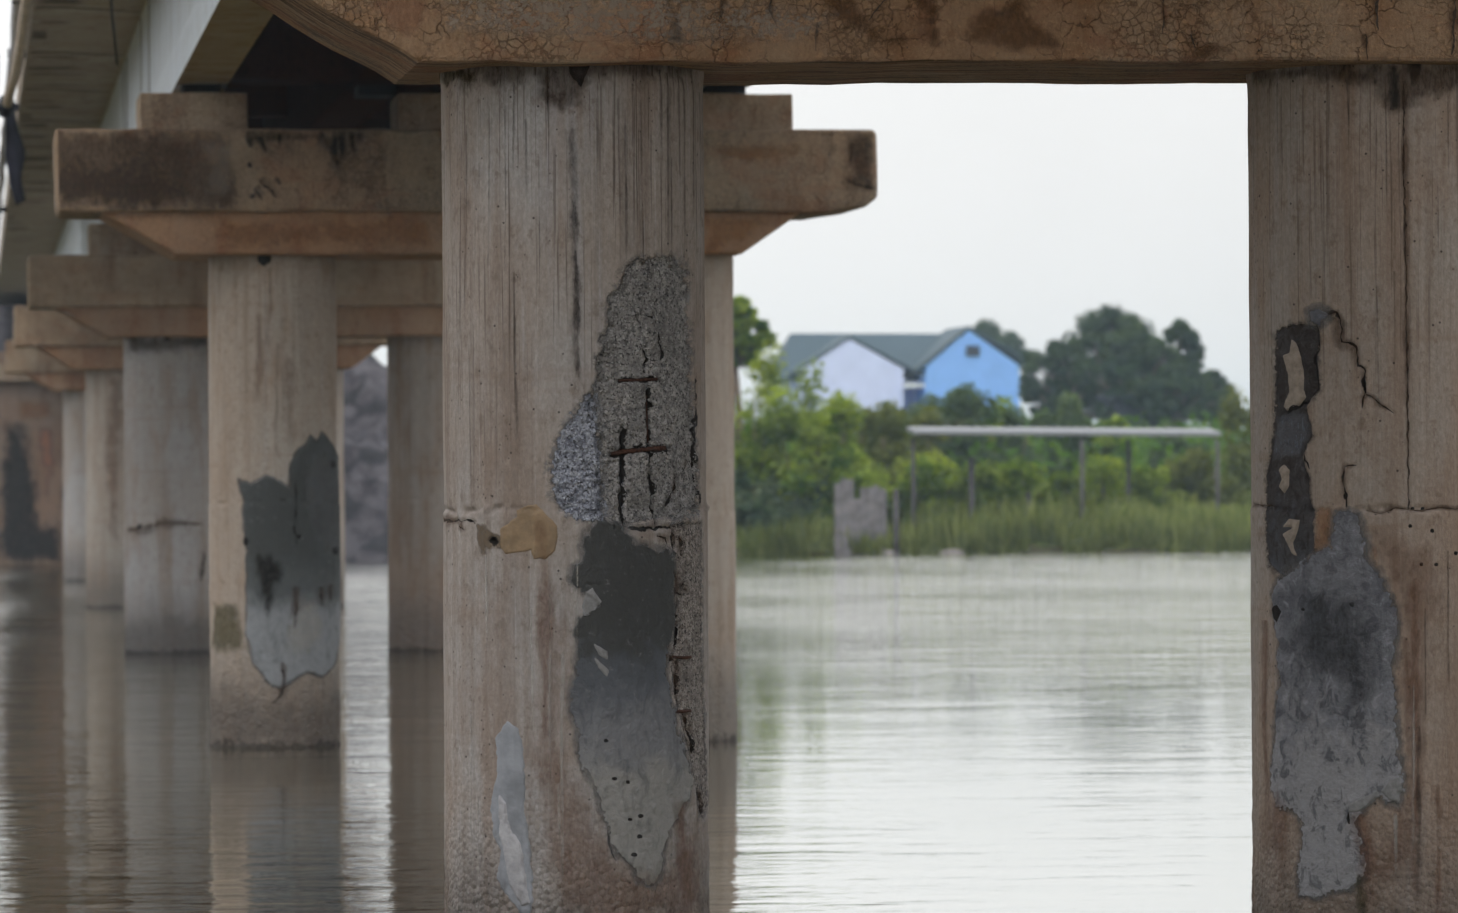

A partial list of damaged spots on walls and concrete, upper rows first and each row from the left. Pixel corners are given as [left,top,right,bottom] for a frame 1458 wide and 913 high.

crack [1363,0,1379,60]
crack [1450,0,1458,55]
damp [23,56,234,210]
crack [1304,83,1458,566]
peeling [1266,324,1320,575]
spalling [476,255,708,817]
spalling [1272,605,1281,622]